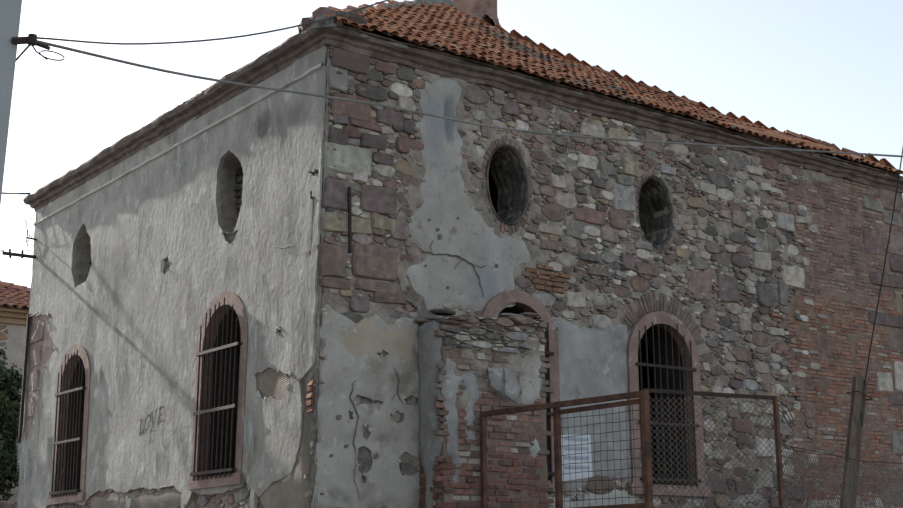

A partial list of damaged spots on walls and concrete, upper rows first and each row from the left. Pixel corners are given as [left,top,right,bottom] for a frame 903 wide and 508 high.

crack [414,241,486,296]
peeling [255,368,292,401]
spalling [336,397,382,423]
peeling [304,368,325,497]
spalling [344,444,379,483]
spalling [397,452,420,477]
peeling [528,438,540,458]